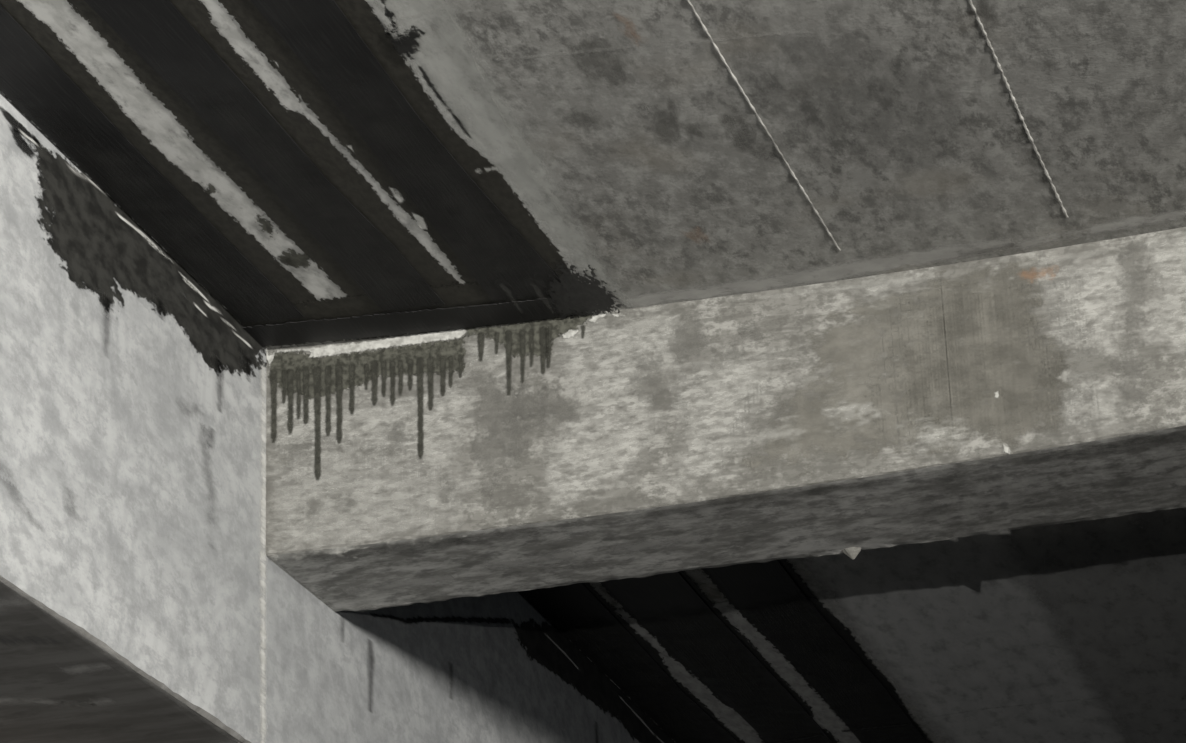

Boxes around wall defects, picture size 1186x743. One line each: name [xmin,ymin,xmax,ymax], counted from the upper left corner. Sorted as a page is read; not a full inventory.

water stain [0,107,676,546]
water stain [623,211,1186,485]